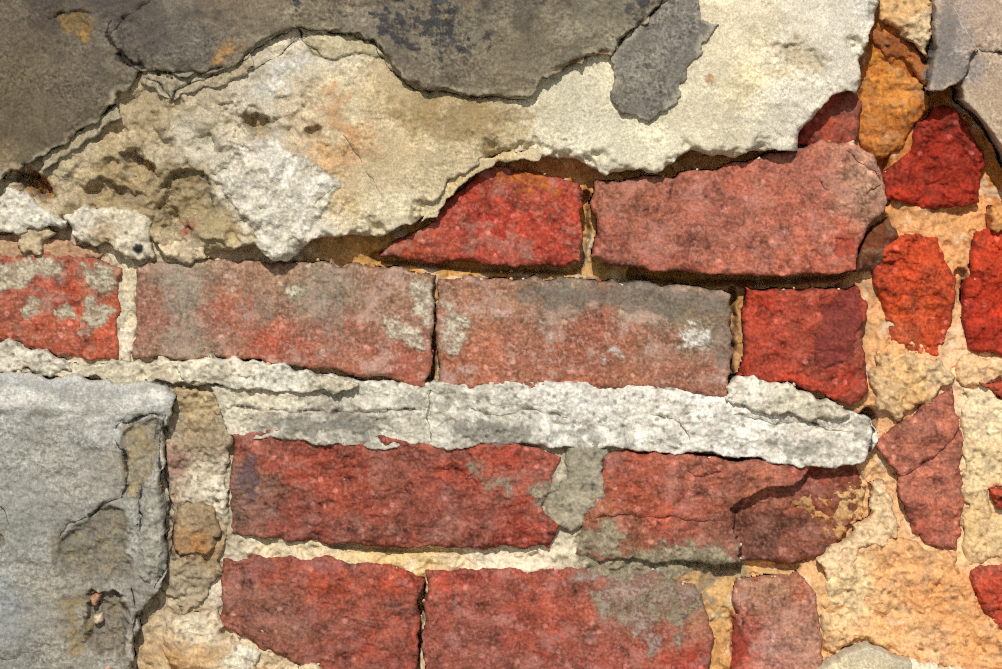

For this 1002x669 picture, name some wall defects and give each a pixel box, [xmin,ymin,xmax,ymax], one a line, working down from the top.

spalling [251,31,386,100]
crack [953,7,1002,79]
spalling [0,186,209,266]
spalling [212,136,341,259]
spalling [809,282,863,368]
spalling [52,502,133,586]
crack [60,413,174,637]
spalling [120,386,235,615]
spalling [783,482,866,539]
spalling [729,610,749,669]
spalling [820,537,1002,669]